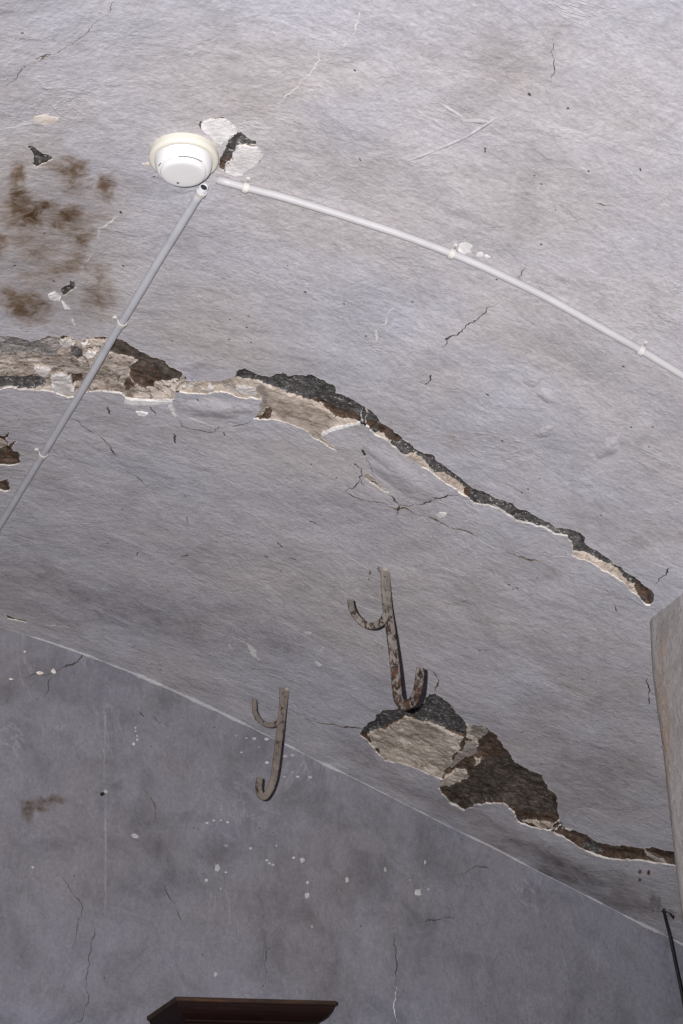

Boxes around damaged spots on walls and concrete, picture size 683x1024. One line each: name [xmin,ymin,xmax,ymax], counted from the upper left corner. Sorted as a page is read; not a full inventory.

spalling [219,132,256,171]
spalling [0,280,368,451]
crack [444,304,497,346]
spalling [0,432,21,492]
crack [343,406,672,611]
spalling [359,693,562,831]